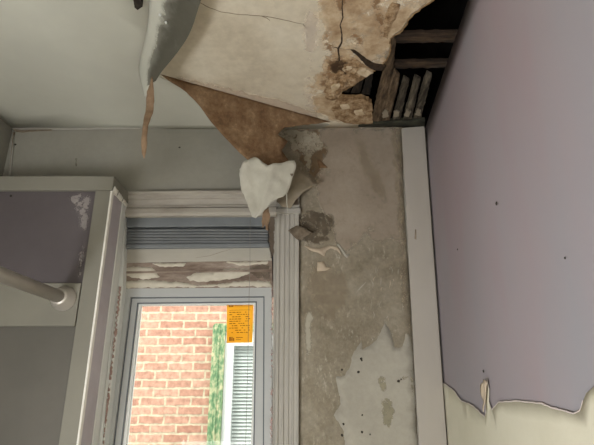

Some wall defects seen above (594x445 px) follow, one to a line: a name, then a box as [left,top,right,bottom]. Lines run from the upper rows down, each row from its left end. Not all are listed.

crack [201,3,307,29]
damp [181,0,431,121]
crack [334,0,386,71]
spalling [383,2,400,39]
peeling [280,57,402,271]
peeling [71,194,90,230]
peeling [109,260,273,380]
peeling [334,323,418,445]
peeling [443,379,594,445]